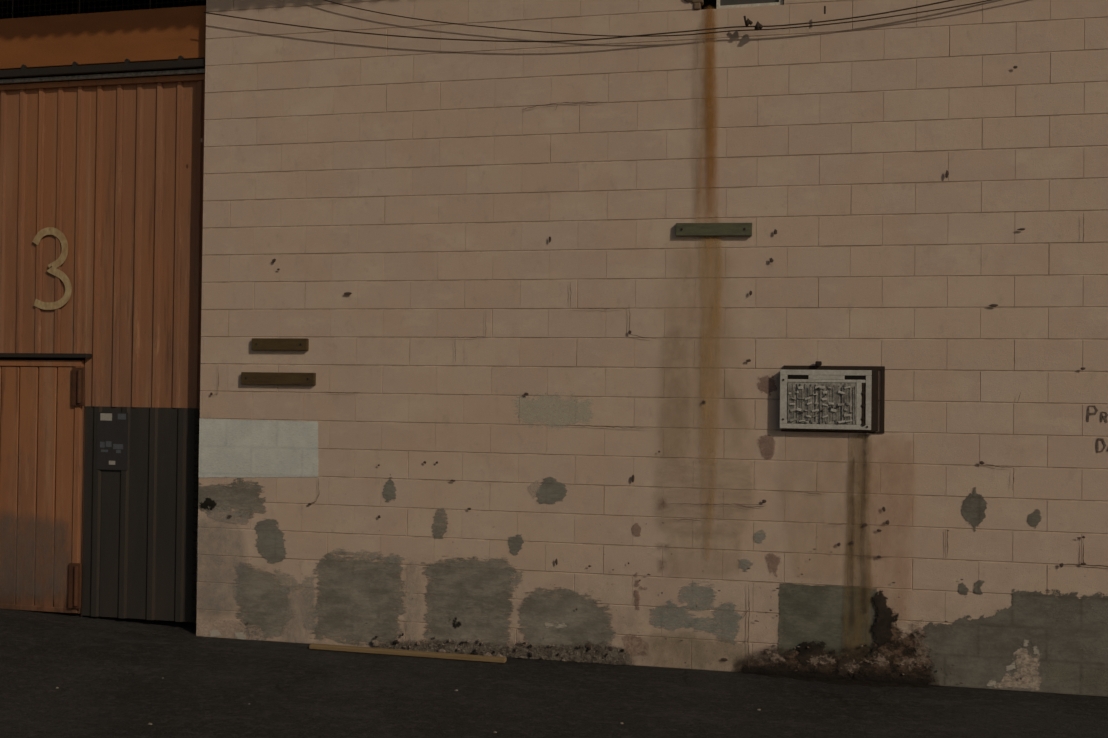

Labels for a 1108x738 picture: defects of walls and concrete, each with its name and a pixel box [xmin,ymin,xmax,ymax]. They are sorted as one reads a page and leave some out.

spalling [742,582,954,685]
peeling [986,640,1042,692]